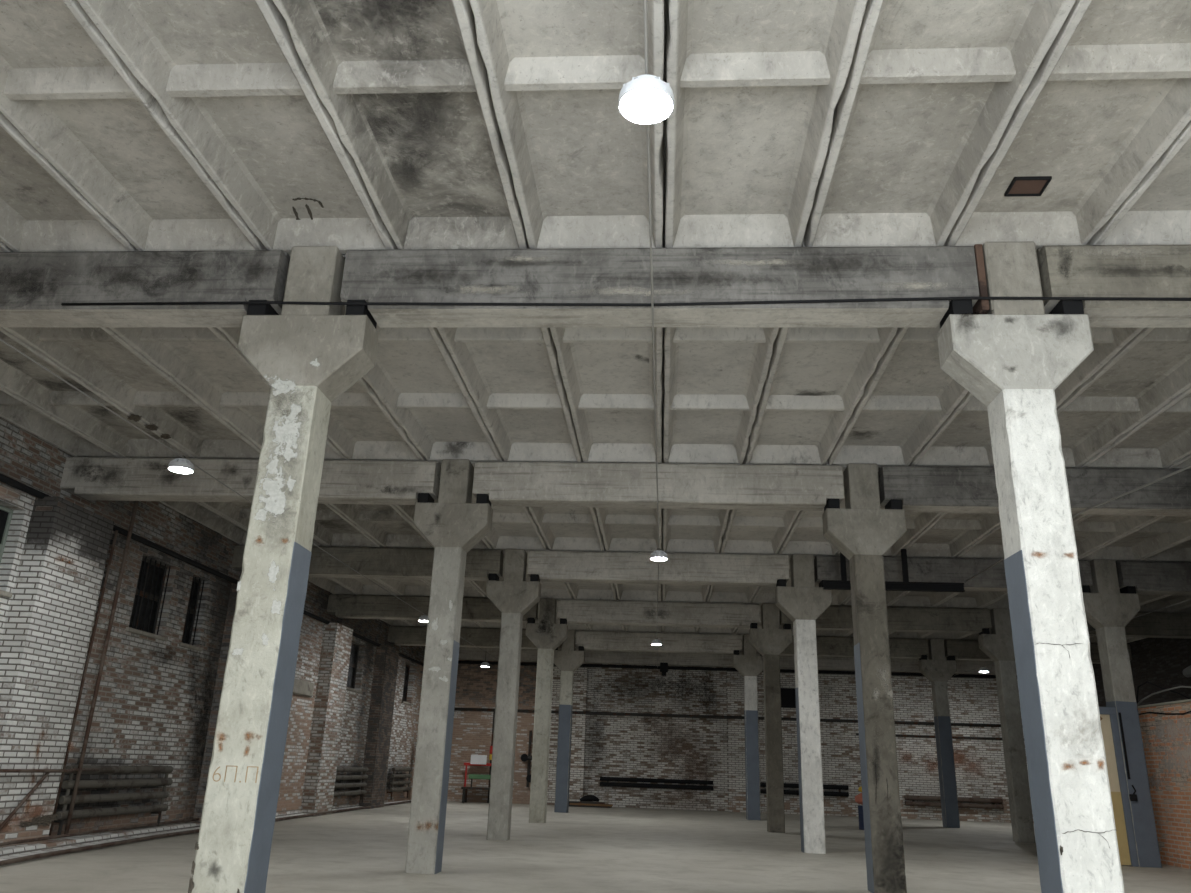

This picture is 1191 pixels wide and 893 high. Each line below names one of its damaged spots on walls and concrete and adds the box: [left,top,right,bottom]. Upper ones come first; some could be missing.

damp [404,92,442,140]
peeling [254,374,305,522]
peeling [267,561,281,614]